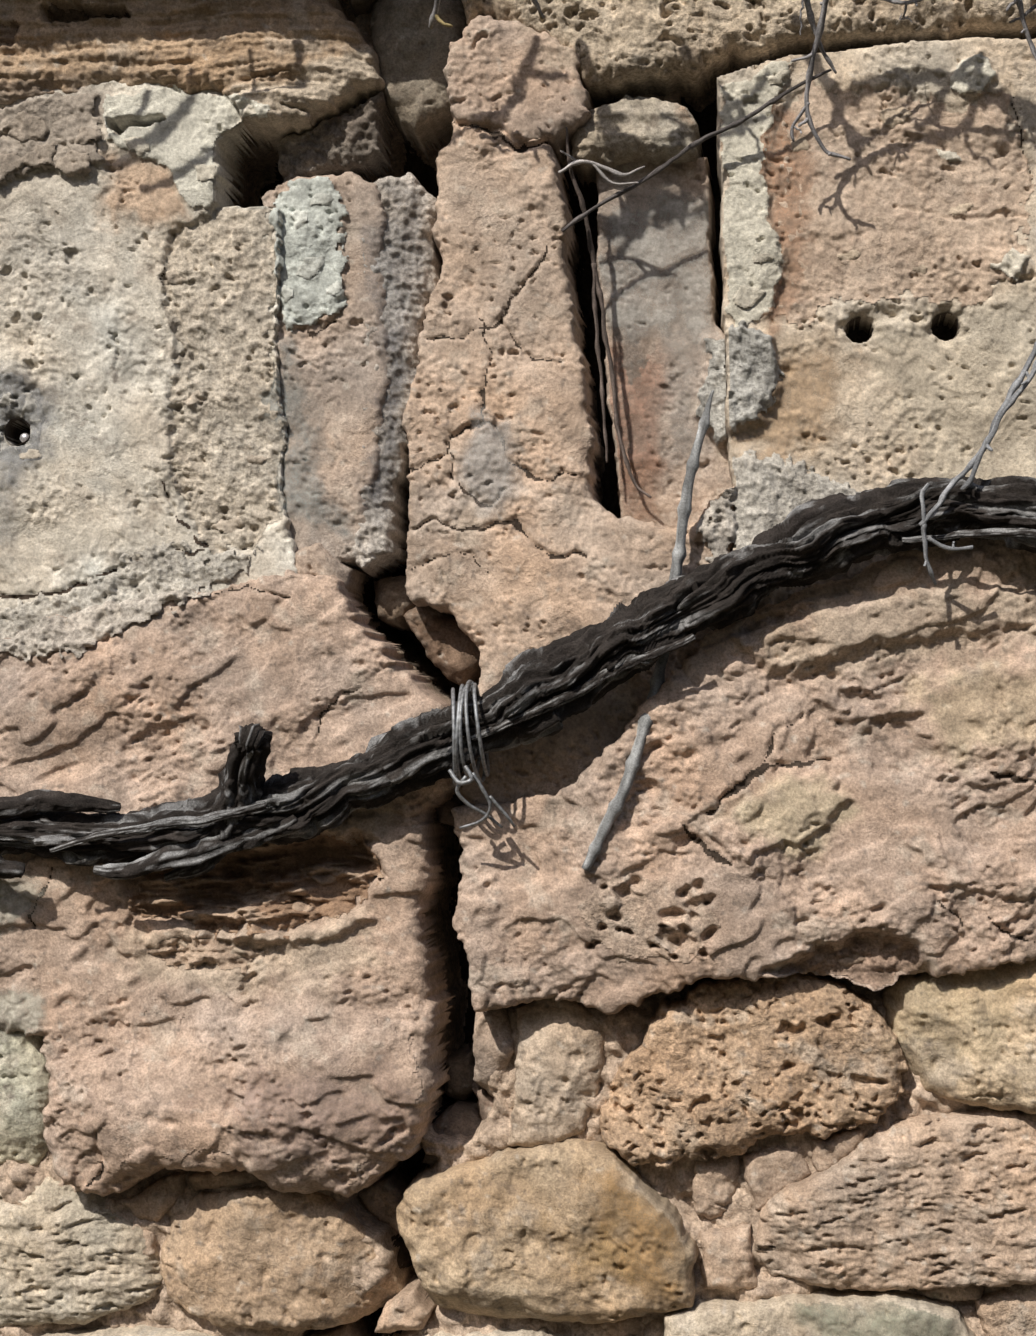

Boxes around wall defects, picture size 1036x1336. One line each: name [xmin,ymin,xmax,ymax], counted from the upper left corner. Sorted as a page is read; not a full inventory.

crack [259,163,284,206]
crack [681,97,724,330]
crack [362,121,621,701]
crack [449,827,476,1044]
crack [397,1093,456,1177]
crack [391,1234,413,1269]
crack [371,1307,402,1336]